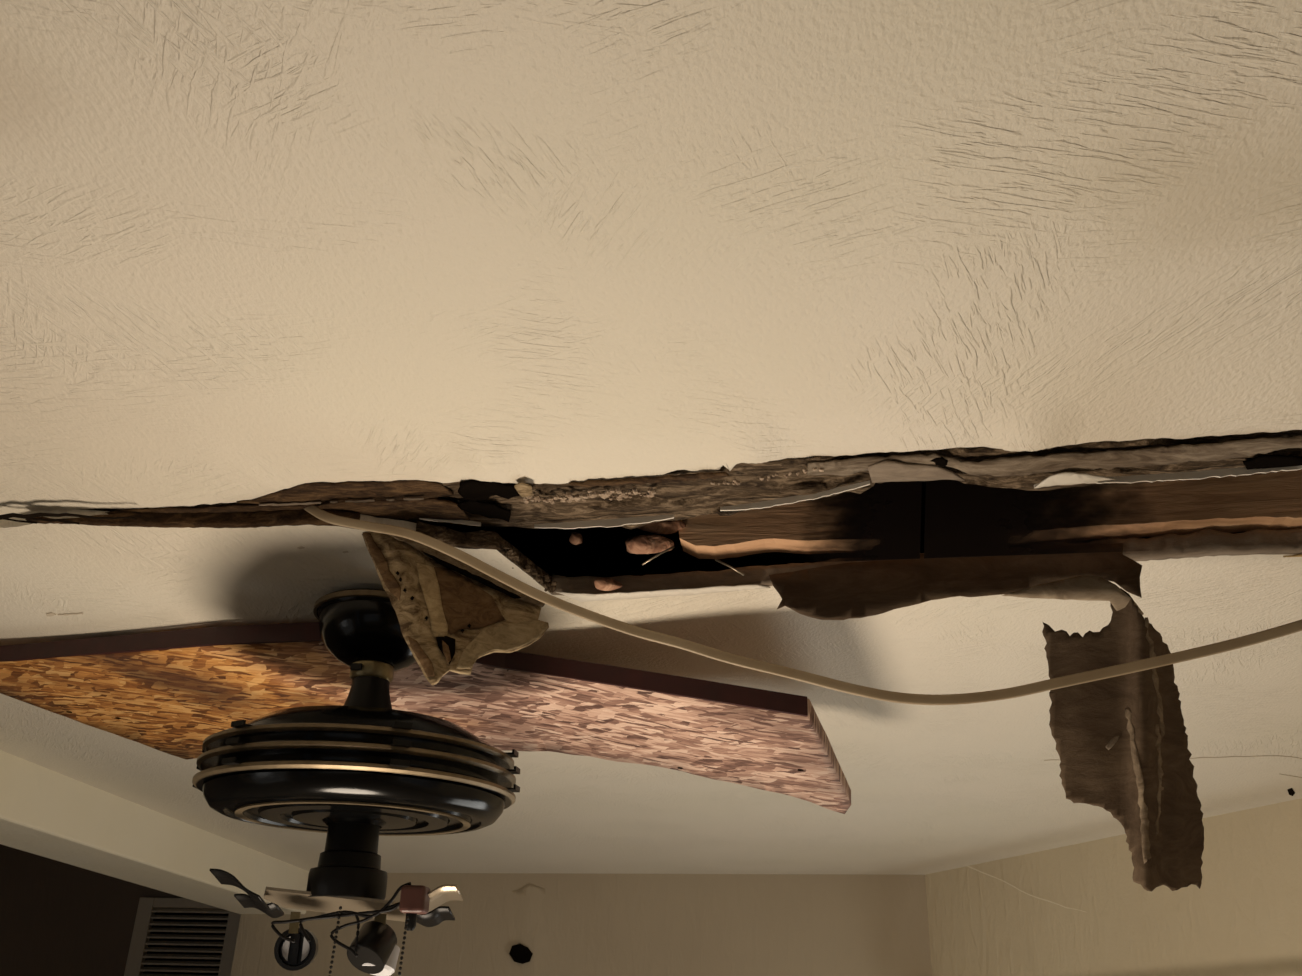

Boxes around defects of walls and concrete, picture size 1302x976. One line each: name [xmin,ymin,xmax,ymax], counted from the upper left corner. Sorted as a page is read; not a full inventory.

peeling [514,483,533,497]
crack [0,513,137,524]
damp [825,480,1106,561]